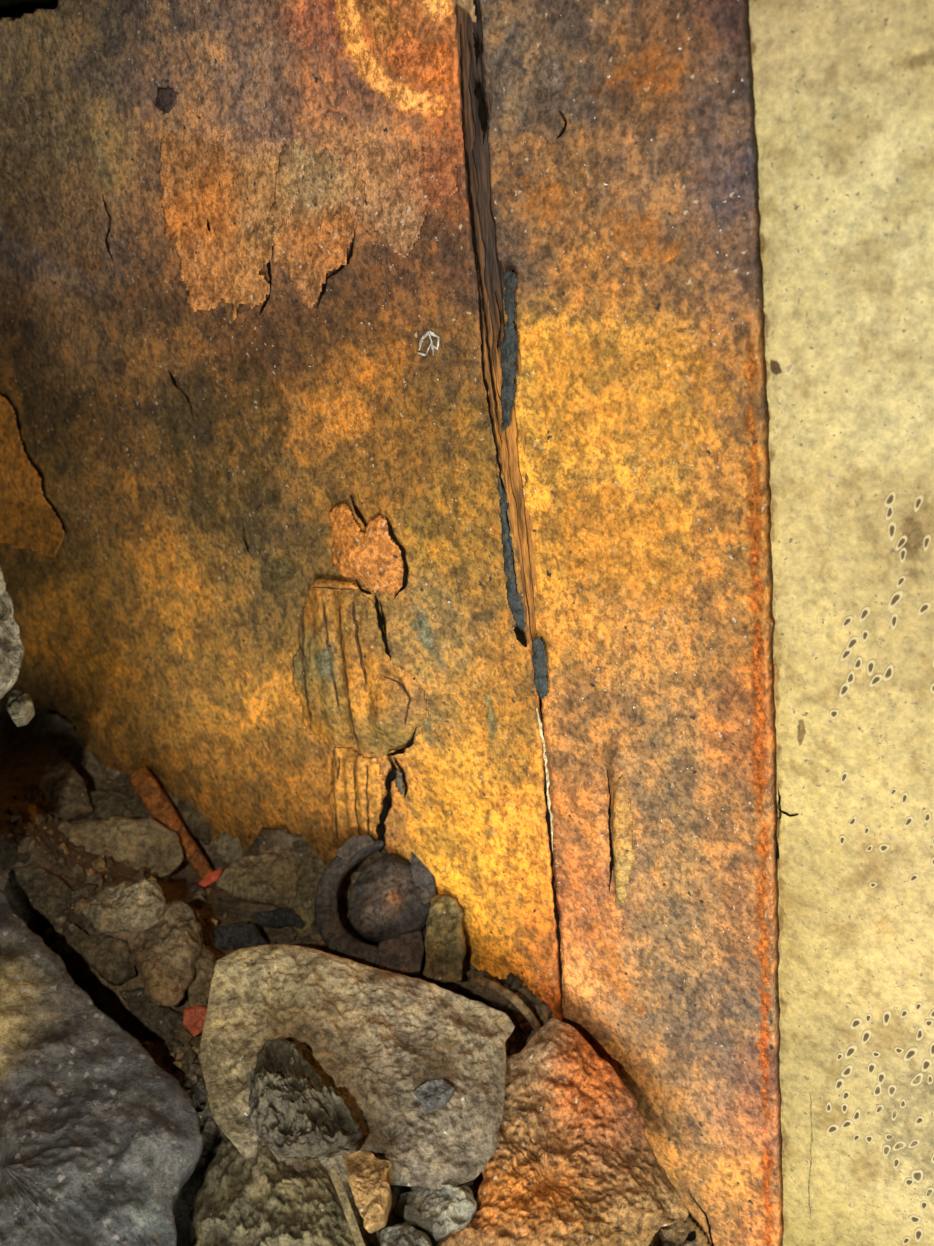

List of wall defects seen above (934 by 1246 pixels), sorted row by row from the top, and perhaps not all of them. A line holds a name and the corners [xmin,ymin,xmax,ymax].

rust [155,86,179,115]
rust [335,0,453,116]
peeling [158,129,458,320]
crack [460,25,517,593]
rust [524,332,712,451]
rust [557,489,693,614]
damp [901,518,924,578]
rust [743,406,785,1120]
crack [543,766,563,1006]
rust [433,1017,696,1246]
rust [761,1131,787,1246]
damp [881,1073,934,1177]